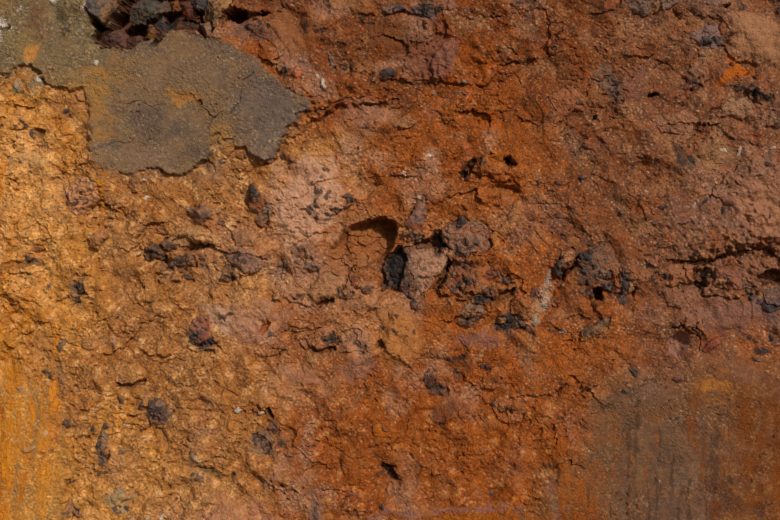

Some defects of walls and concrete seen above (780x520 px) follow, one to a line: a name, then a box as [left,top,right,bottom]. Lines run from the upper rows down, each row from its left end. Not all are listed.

corrosion [0,340,62,520]
spalling [0,64,608,520]
spalling [207,0,780,406]